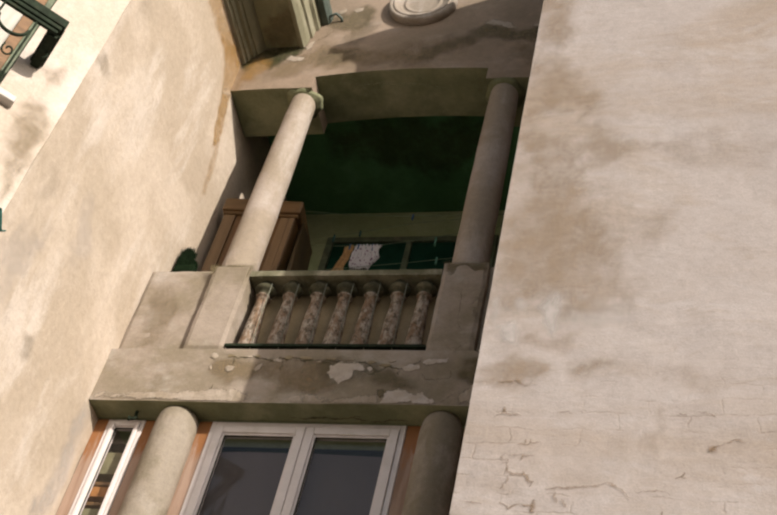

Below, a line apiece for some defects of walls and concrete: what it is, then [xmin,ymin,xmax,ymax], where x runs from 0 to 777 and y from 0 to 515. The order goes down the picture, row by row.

water stain [333,7,373,30]
water stain [479,25,539,39]
water stain [242,14,448,76]
flaking render [327,361,373,384]
water stain [459,358,478,384]
flaking render [285,389,434,404]
crack [500,440,566,513]